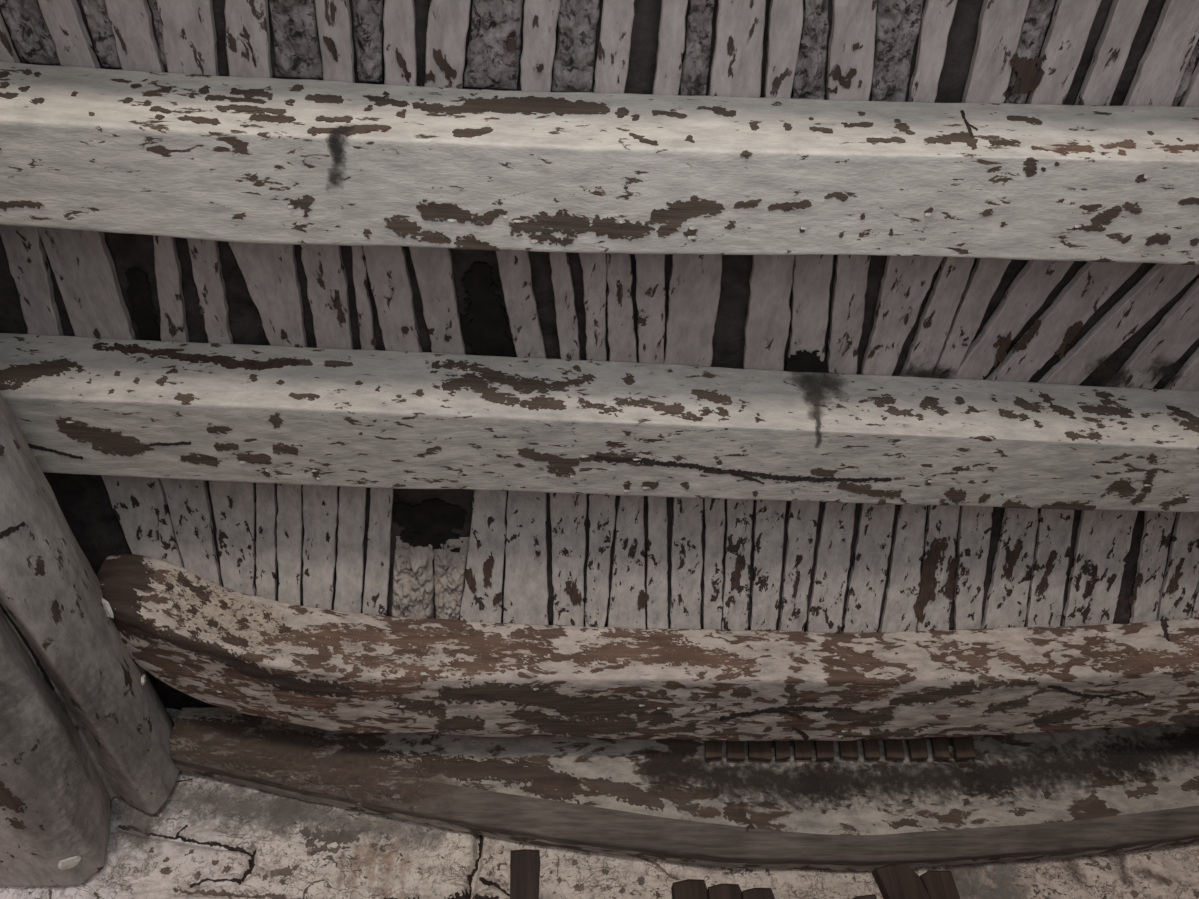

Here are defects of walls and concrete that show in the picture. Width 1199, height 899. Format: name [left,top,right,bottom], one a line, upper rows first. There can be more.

damp [328,126,351,185]
peeling [122,84,687,146]
peeling [809,111,1137,177]
peeling [363,192,848,251]
peeling [92,328,353,401]
peeling [430,359,765,423]
damp [793,371,841,447]
peeling [97,554,757,737]
peeling [824,638,1087,739]
crack [118,825,310,899]
crack [371,835,510,899]
crack [640,858,680,880]